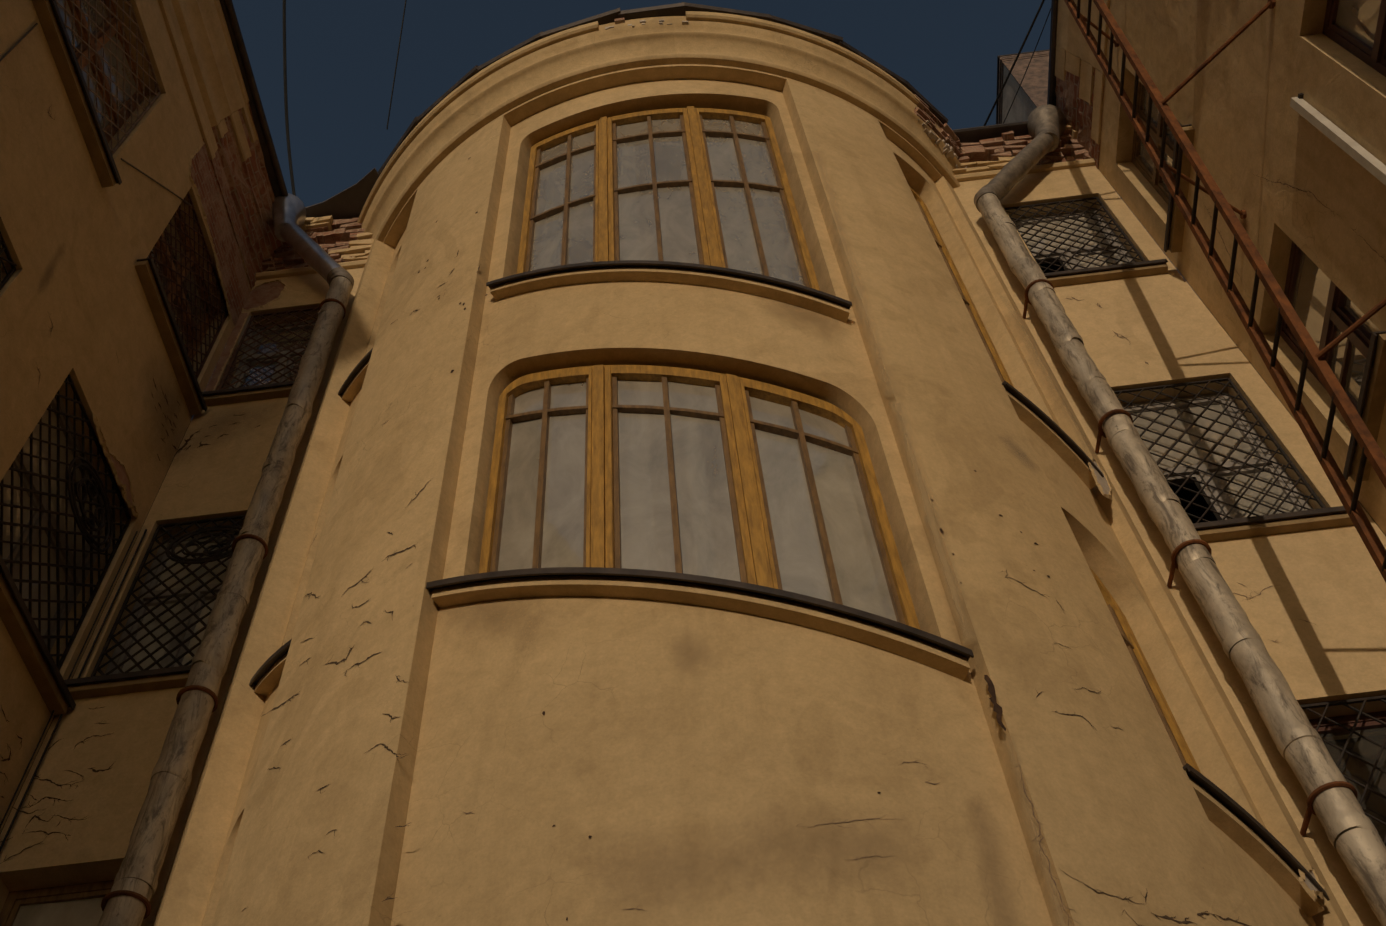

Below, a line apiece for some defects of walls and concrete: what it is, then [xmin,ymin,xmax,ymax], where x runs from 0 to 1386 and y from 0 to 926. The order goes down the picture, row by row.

spalling [189,142,251,329]
crack [0,705,116,864]
crack [261,532,416,760]
crack [797,815,888,860]
crack [1002,569,1071,649]
crack [1035,687,1122,731]
crack [1011,758,1250,926]